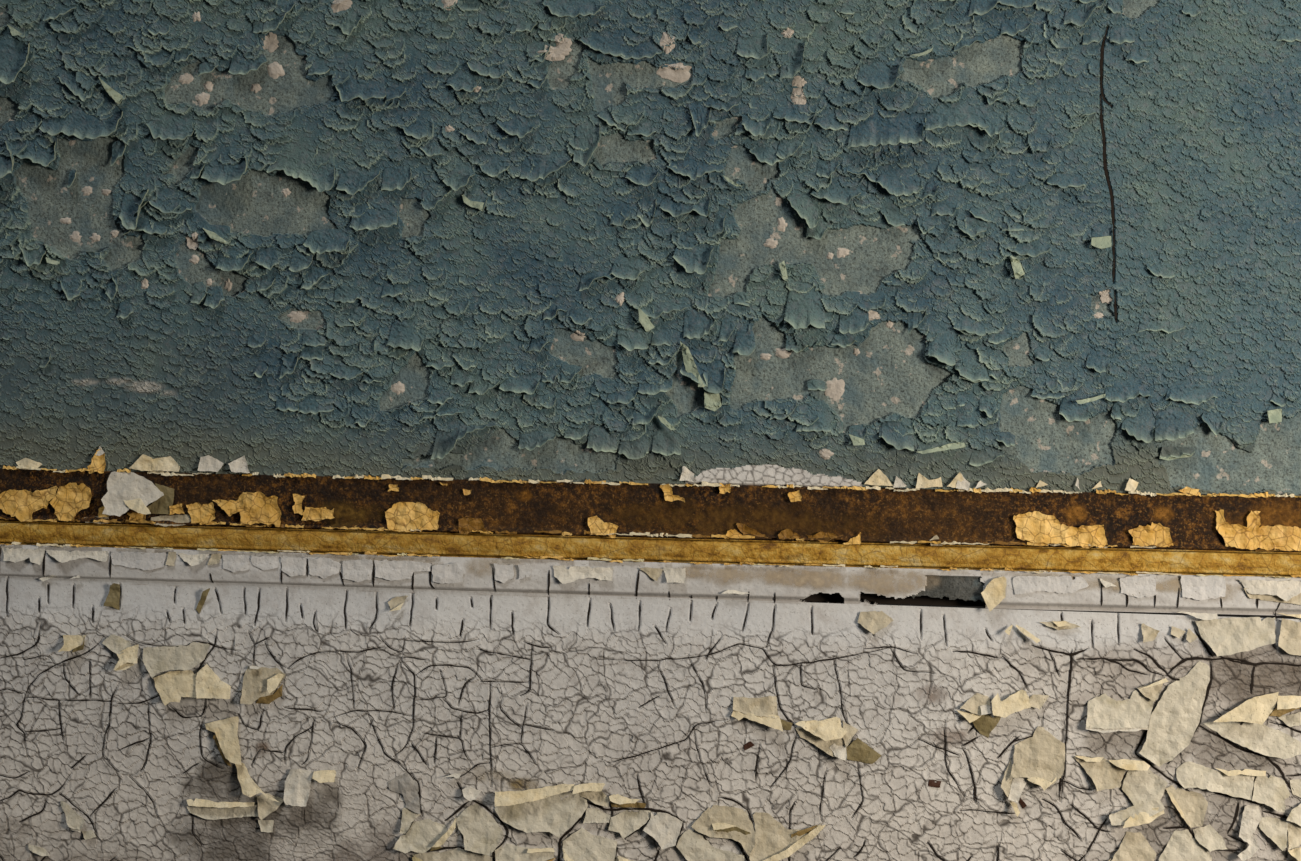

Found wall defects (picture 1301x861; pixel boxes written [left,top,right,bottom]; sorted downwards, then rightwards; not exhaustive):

crack [1100,26,1117,322]
peeling [0,0,1301,552]
rust [620,505,831,542]
rust [1067,506,1086,521]
rust [1155,508,1173,519]
rust [1242,505,1301,527]
spalling [800,592,844,604]
peeling [102,634,336,833]
crack [0,546,1301,861]
peeling [731,696,882,764]
peeling [858,567,1301,861]
peeling [388,772,825,861]